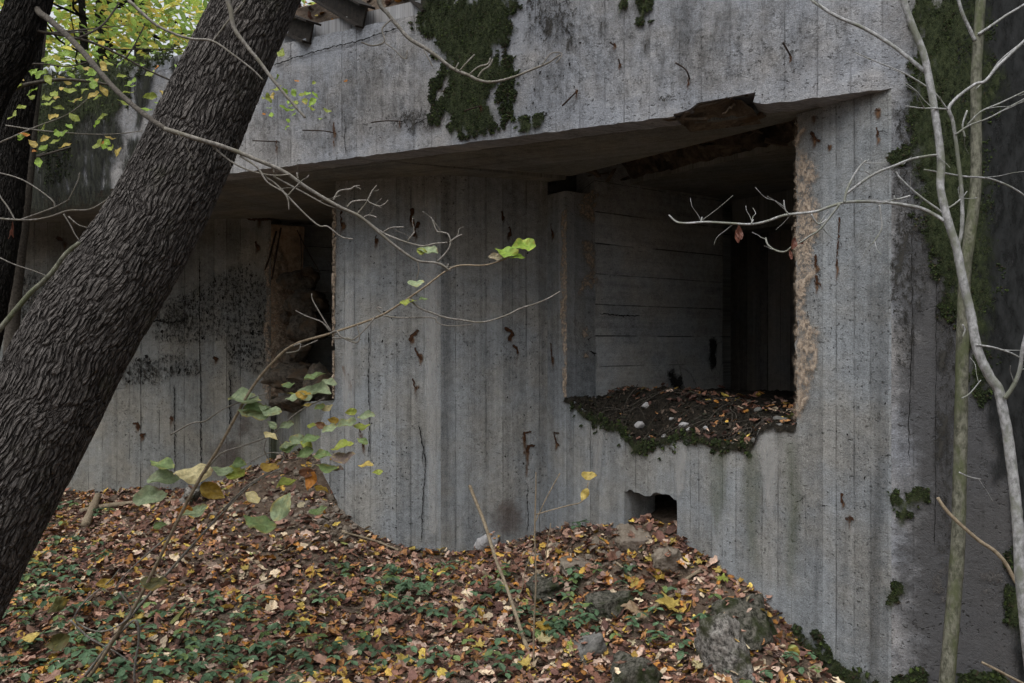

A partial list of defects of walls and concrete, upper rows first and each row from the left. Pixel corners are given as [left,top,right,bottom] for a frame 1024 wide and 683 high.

spalling [663,94,766,132]
corrosion [810,116,832,151]
spalling [793,124,828,418]
corrosion [408,329,423,363]
corrosion [522,431,535,476]
crack [418,427,426,539]